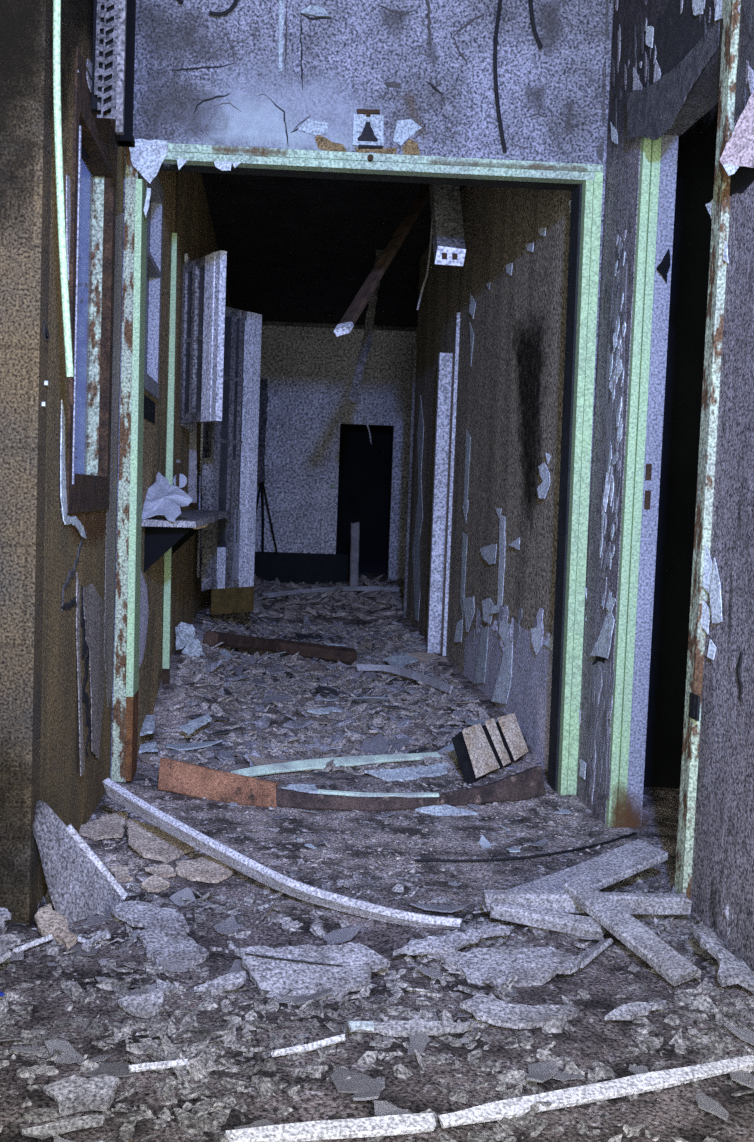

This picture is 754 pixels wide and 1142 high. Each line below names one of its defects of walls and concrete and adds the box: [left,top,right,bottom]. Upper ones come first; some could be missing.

crack [134,29,311,144]
flaking render [208,102,422,156]
crack [370,0,485,94]
crack [435,123,471,137]
crack [508,113,566,148]
spalling [596,0,724,164]
peeling [720,0,754,196]
peeling [579,230,627,804]
peeling [454,429,554,770]
rust [613,790,640,828]